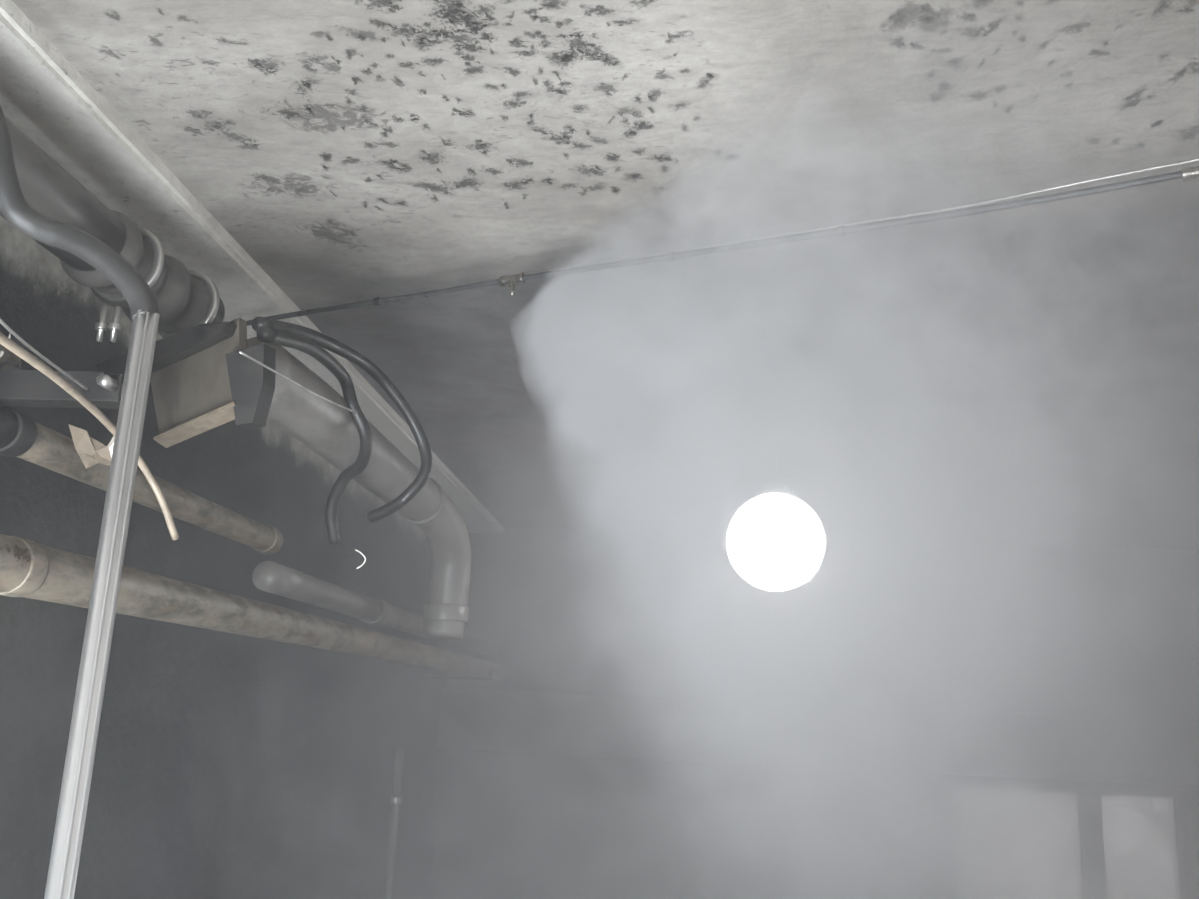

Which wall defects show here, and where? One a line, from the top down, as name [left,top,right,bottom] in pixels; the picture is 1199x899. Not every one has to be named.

water stain [257,0,716,209]
water stain [889,0,1012,113]